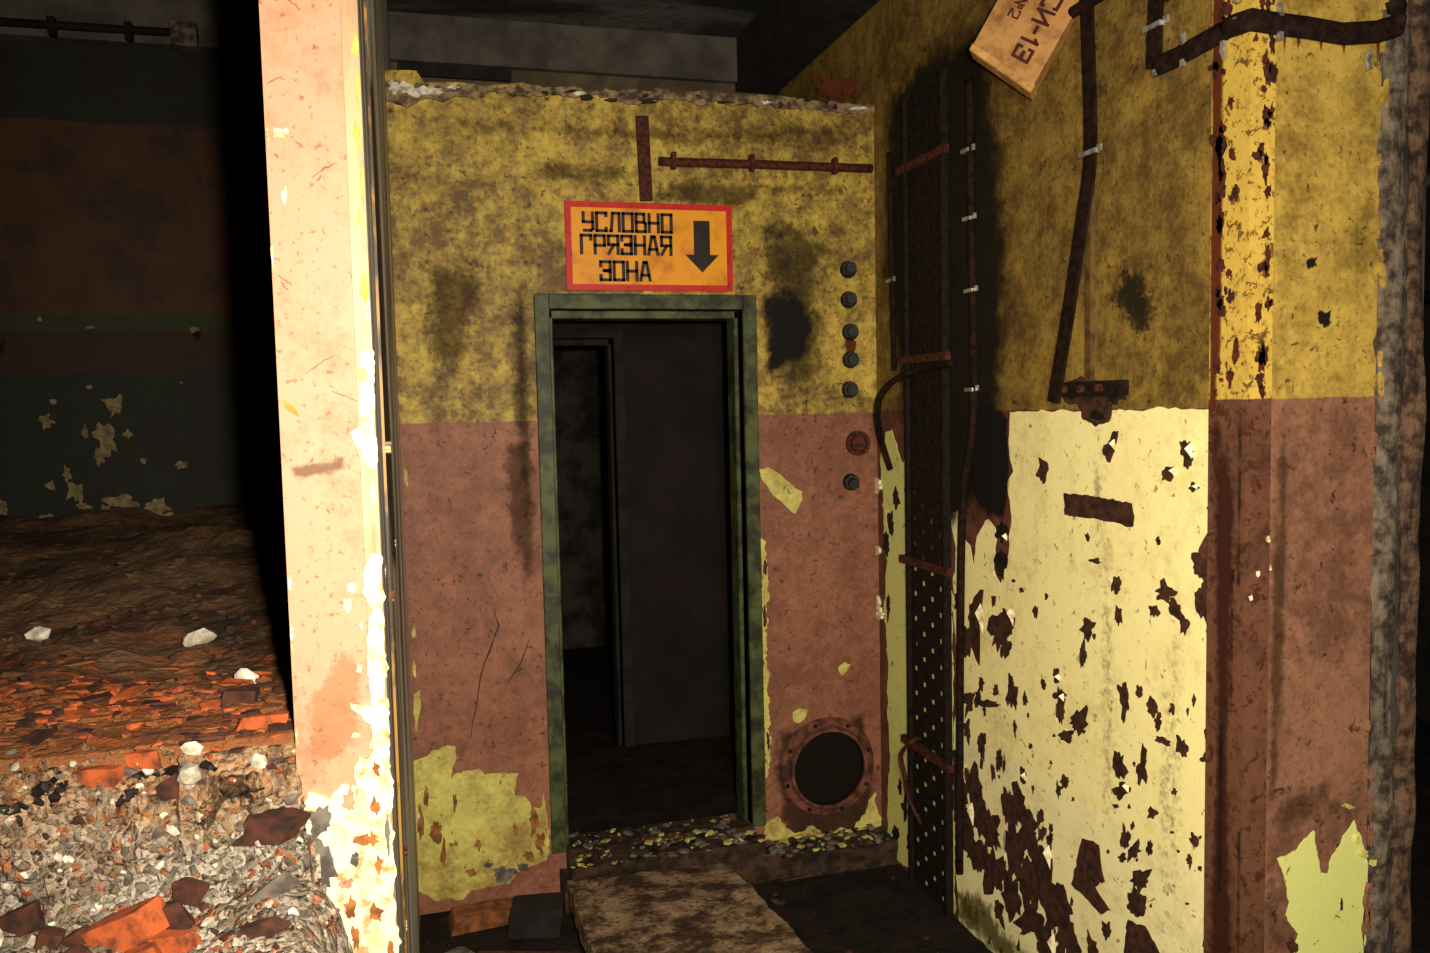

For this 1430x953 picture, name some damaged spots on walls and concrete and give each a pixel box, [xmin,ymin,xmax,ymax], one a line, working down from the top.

rust [1213,0,1233,25]
rust [1259,0,1275,11]
peeling [38,399,57,430]
peeling [81,385,133,467]
peeling [44,464,174,516]
rust [1208,33,1300,953]
spalling [1277,0,1430,953]
peeling [304,539,550,953]
peeling [761,538,772,778]
peeling [759,376,1209,953]